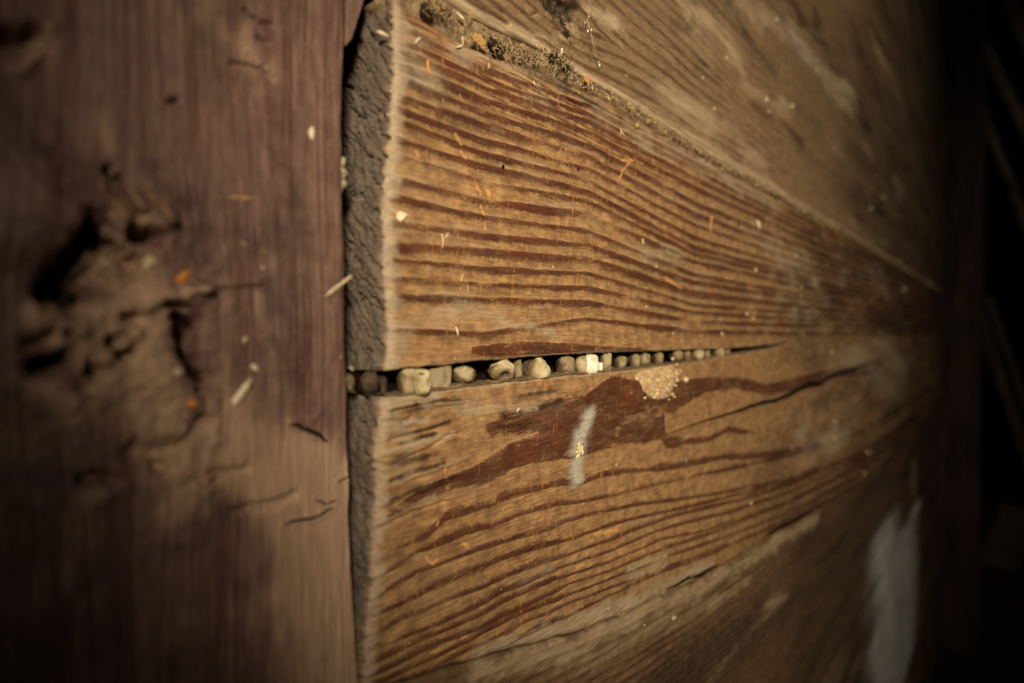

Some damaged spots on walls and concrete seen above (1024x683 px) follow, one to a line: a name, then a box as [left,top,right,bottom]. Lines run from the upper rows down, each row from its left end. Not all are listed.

crack [666,361,878,435]
crack [290,424,328,442]
crack [285,476,349,525]